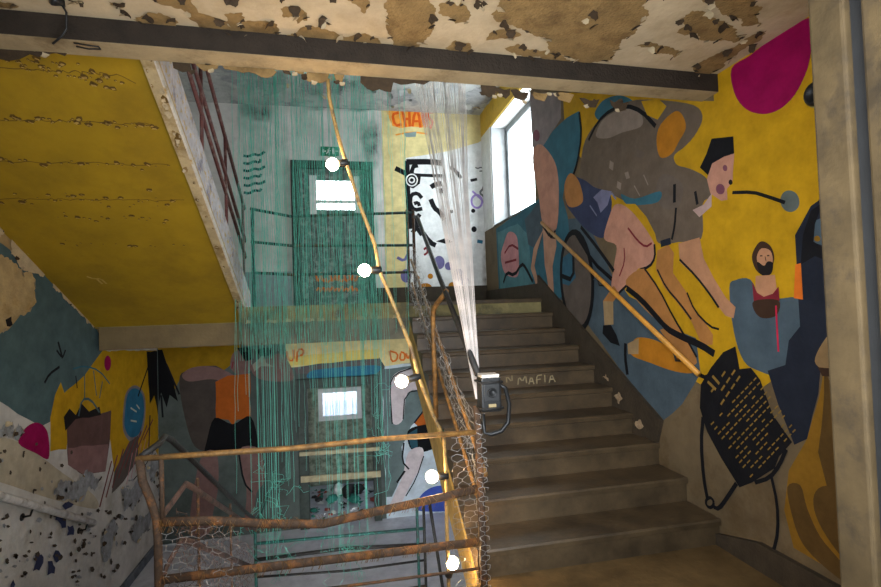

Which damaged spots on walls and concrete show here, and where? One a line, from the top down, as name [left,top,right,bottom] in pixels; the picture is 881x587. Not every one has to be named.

peeling [0,49,136,91]
peeling [109,0,649,64]
peeling [638,42,687,60]
spalling [0,228,45,333]
peeling [53,284,94,328]
peeling [0,421,25,441]
peeling [0,469,160,587]